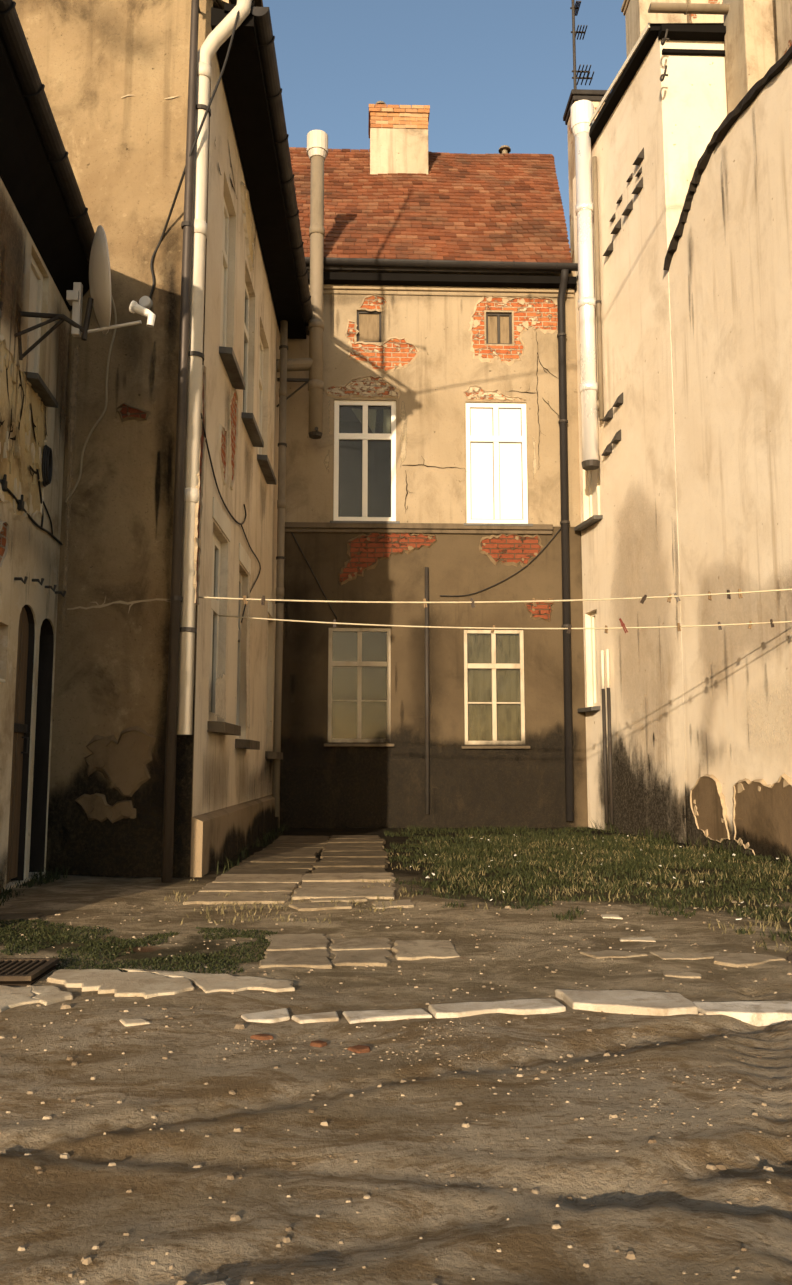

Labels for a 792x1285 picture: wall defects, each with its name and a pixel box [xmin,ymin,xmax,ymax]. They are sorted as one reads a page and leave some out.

flaking render [324,295,420,399]
flaking render [468,296,558,366]
flaking render [0,334,47,568]
spalling [75,726,158,823]
damp [599,733,792,861]
spalling [690,773,792,862]